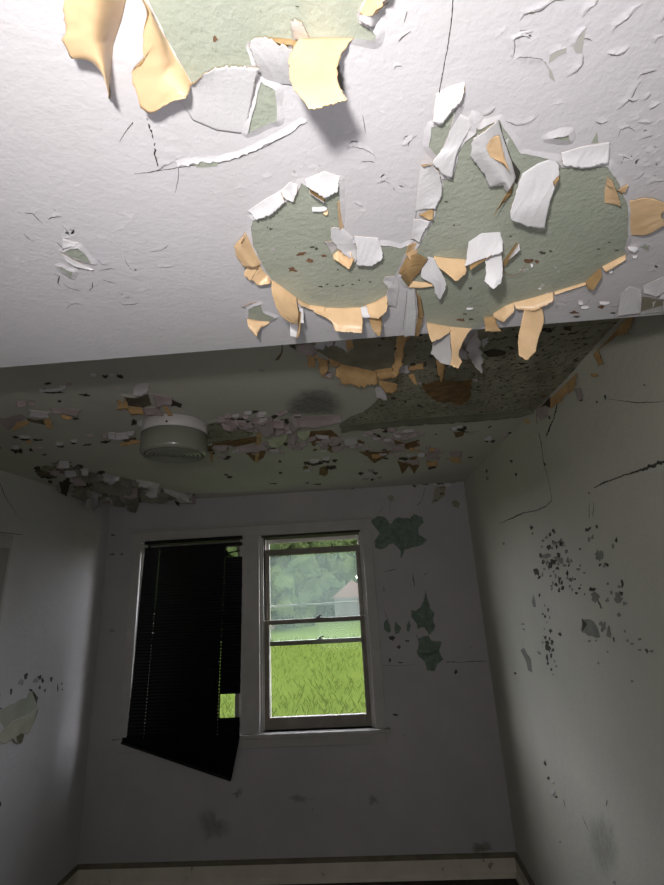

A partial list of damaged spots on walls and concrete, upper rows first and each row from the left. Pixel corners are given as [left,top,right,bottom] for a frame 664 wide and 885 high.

peeling [61,0,126,98]
peeling [131,0,388,171]
crack [439,0,453,93]
peeling [491,0,598,82]
peeling [206,65,664,485]
peeling [0,373,195,513]
crack [501,405,560,523]
crack [594,460,664,491]
peeling [371,514,427,558]
flaking render [530,525,627,617]
peeling [384,588,444,672]
flaking render [521,593,562,675]